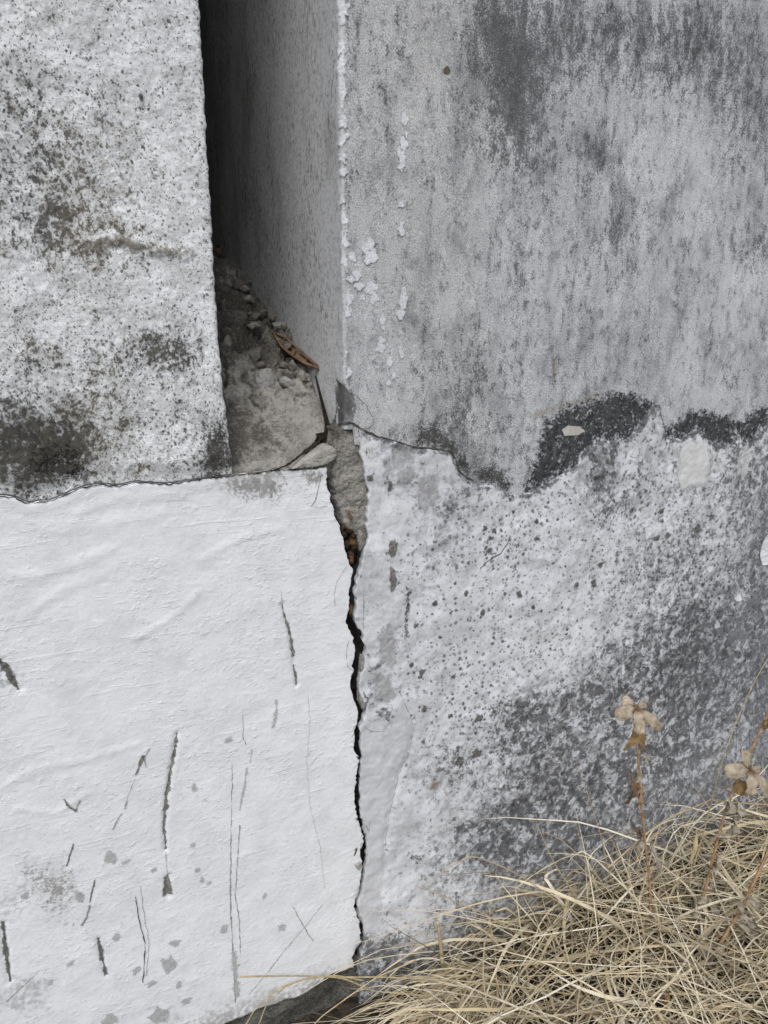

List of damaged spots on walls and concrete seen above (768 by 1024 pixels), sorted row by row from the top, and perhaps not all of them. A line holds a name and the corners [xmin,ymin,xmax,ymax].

peeling [337,0,350,25]
peeling [336,41,350,177]
peeling [396,112,409,172]
peeling [339,197,409,386]
leakage [0,386,106,502]
spalling [289,349,439,536]
leakage [416,389,768,494]
crack [0,376,477,870]
crack [135,887,149,983]
crack [354,902,362,955]